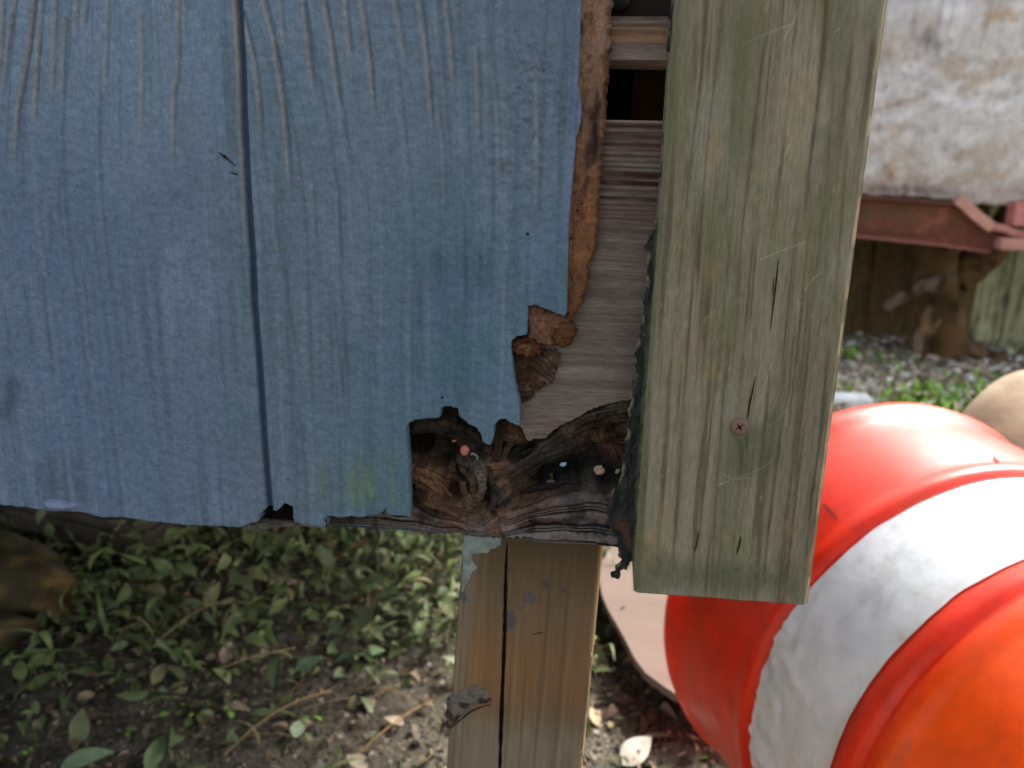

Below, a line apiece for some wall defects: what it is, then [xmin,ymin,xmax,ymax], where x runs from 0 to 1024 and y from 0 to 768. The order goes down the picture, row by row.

peeling [512,0,614,402]
crack [770,264,778,330]
crack [452,543,508,768]